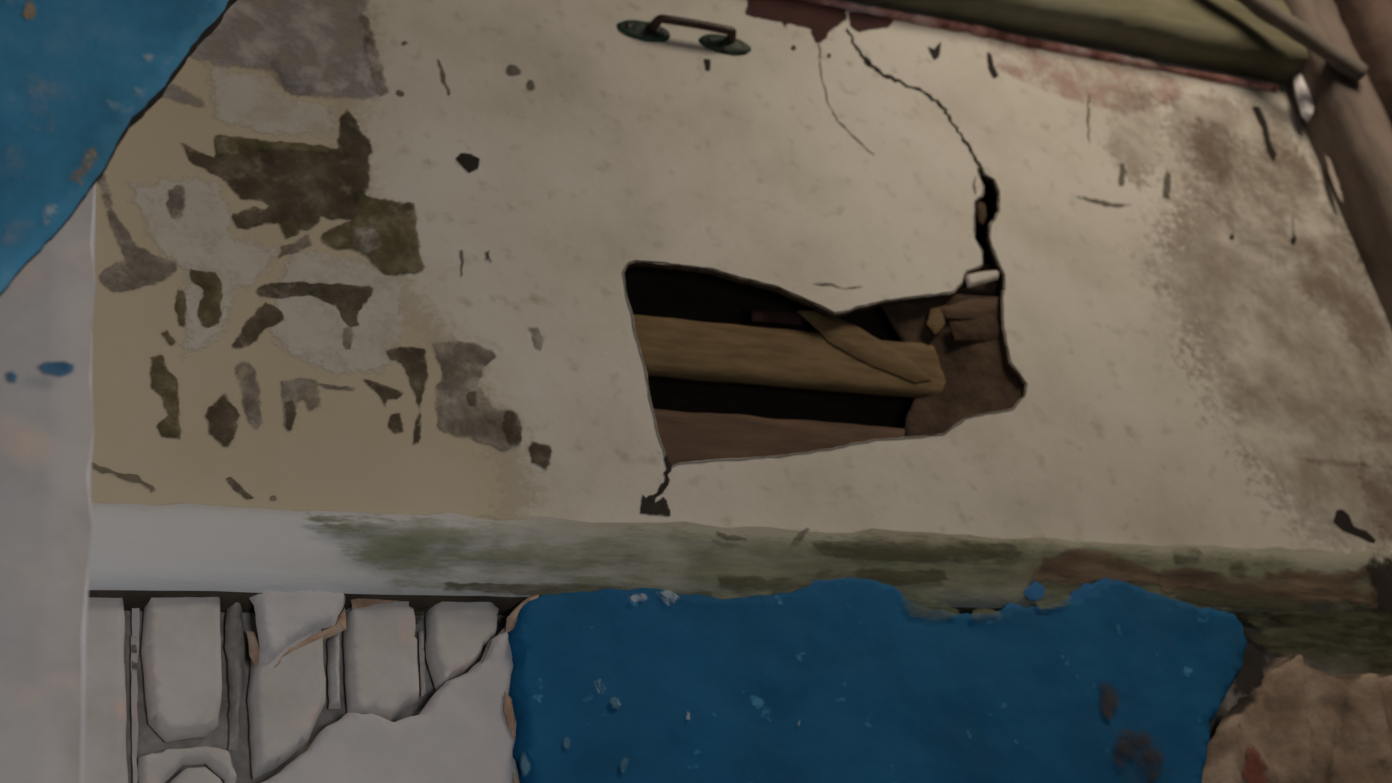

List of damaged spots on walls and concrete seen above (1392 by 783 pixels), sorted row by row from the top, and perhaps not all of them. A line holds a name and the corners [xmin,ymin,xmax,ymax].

peeling [185,0,424,275]
crack [818,28,981,194]
peeling [746,0,1315,161]
damp [1078,196,1125,207]
damp [1163,171,1171,198]
peeling [98,174,223,438]
peeling [206,281,372,447]
hole [623,163,1028,466]
crack [640,456,672,516]
damp [675,530,1392,676]
flaking render [84,590,499,783]
flaking render [1202,644,1392,783]